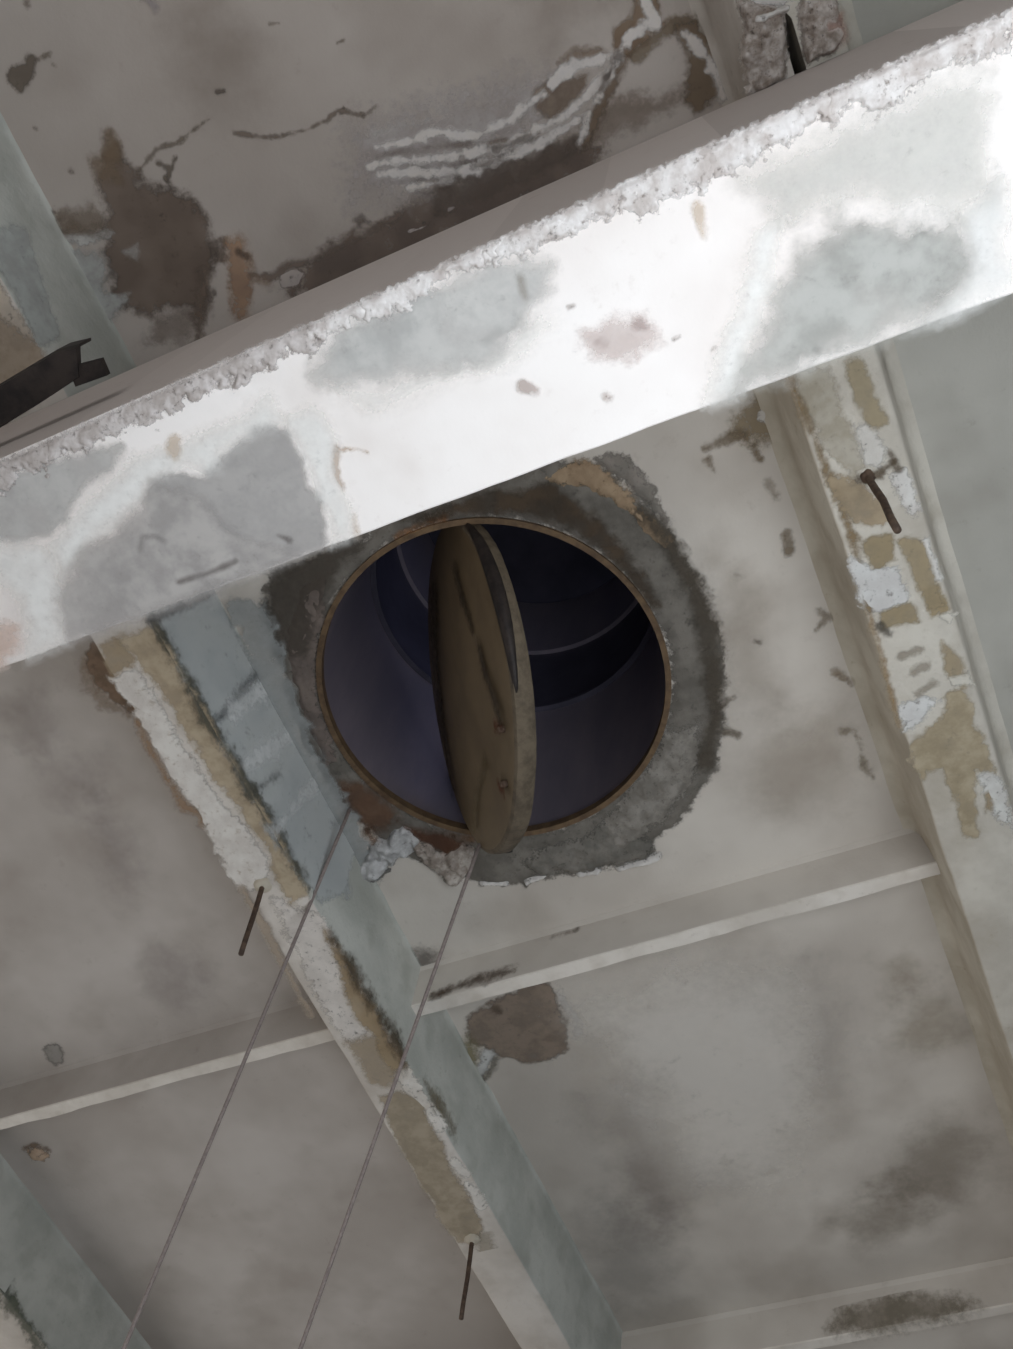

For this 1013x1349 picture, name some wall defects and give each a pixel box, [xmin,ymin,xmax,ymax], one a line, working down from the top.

spalling [0,0,1013,497]
damp [710,90,1009,401]
damp [0,401,369,866]
damp [406,482,661,607]
peeling [593,452,669,525]
peeling [782,531,794,556]
peeling [793,357,1013,838]
spalling [360,826,546,887]
peeling [576,852,662,877]
peeling [100,627,493,1252]
damp [831,1295,966,1333]